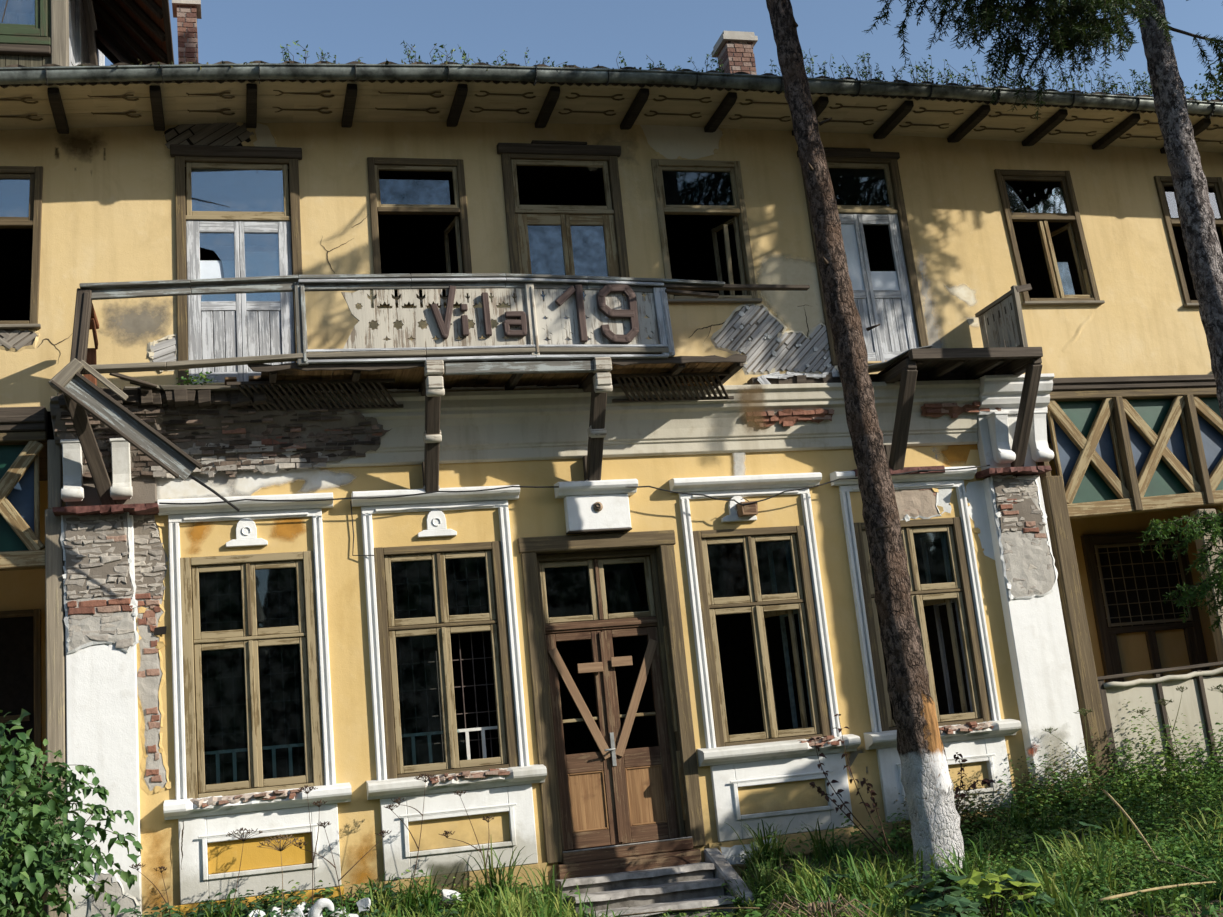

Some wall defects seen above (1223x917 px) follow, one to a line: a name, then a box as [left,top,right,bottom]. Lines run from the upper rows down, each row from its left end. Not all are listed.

crack [321,218,366,273]
leakage [108,304,166,342]
peeling [946,284,979,327]
flaking render [54,408,92,478]
flaking render [86,398,391,500]
flaking render [747,408,834,427]
flaking render [921,401,1001,418]
flaking render [895,475,1058,600]
flaking render [60,512,173,795]